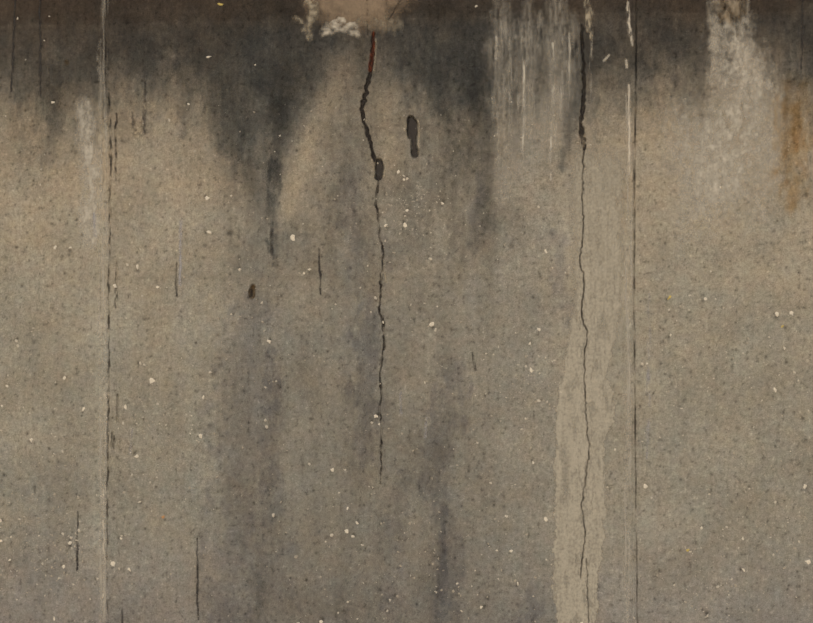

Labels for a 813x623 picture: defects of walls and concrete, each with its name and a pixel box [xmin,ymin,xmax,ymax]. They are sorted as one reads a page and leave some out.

peeling [303,0,399,36]
crack [360,31,377,162]
spalling [407,116,419,157]
damp [678,0,770,213]
crack [378,242,386,464]
crack [579,25,589,478]